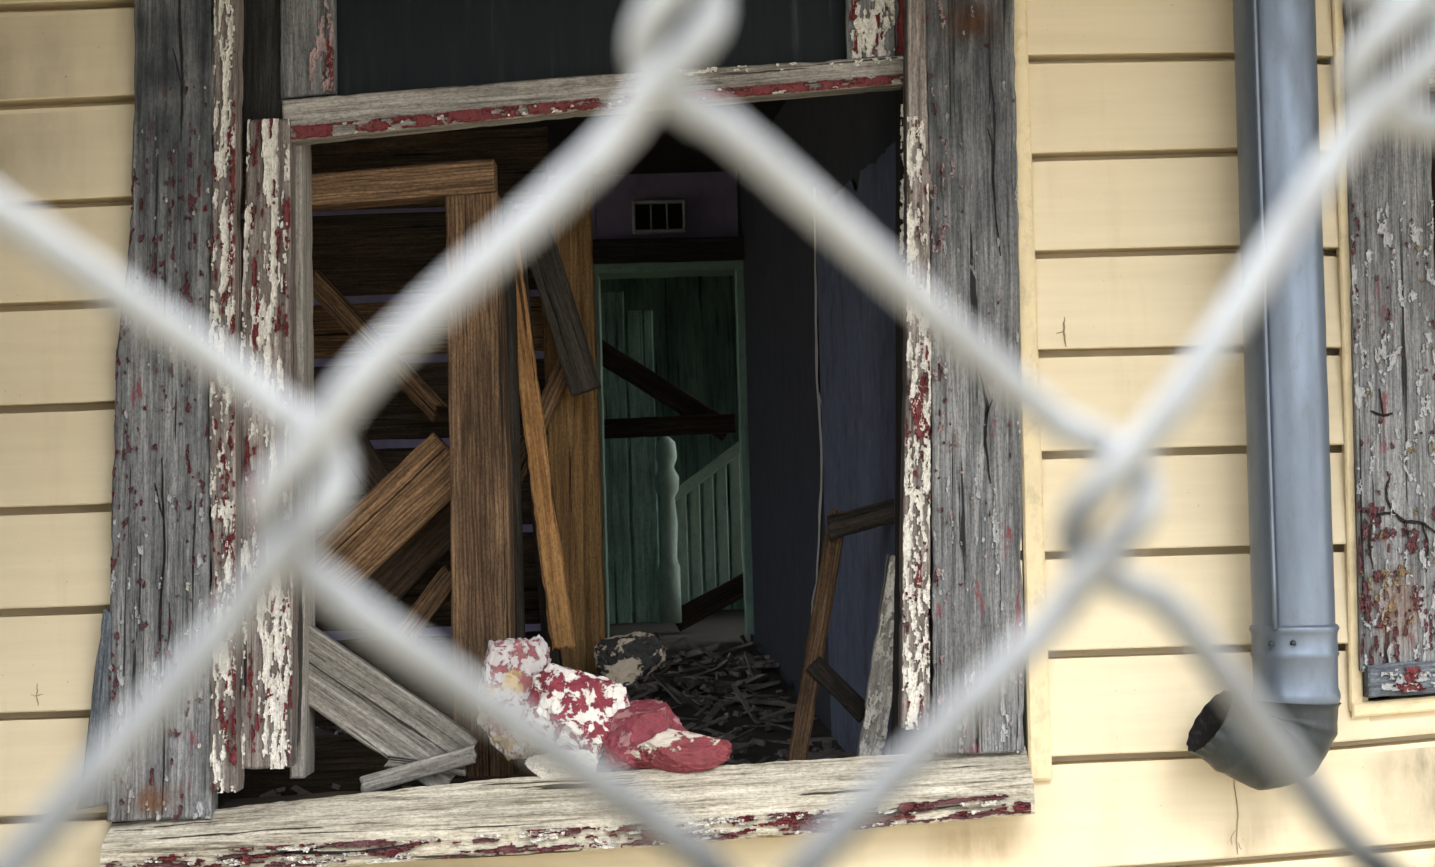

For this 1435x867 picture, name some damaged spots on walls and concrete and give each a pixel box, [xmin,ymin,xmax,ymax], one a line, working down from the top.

peeling [129,0,621,388]
peeling [899,73,1001,318]
peeling [115,318,131,380]
peeling [108,347,286,718]
peeling [859,315,1000,756]
peeling [1351,200,1435,693]
crack [1358,477,1435,573]
peeling [119,584,293,820]
peeling [106,824,654,867]
peeling [688,809,830,840]
peeling [870,791,1031,828]
peeling [996,696,1019,753]